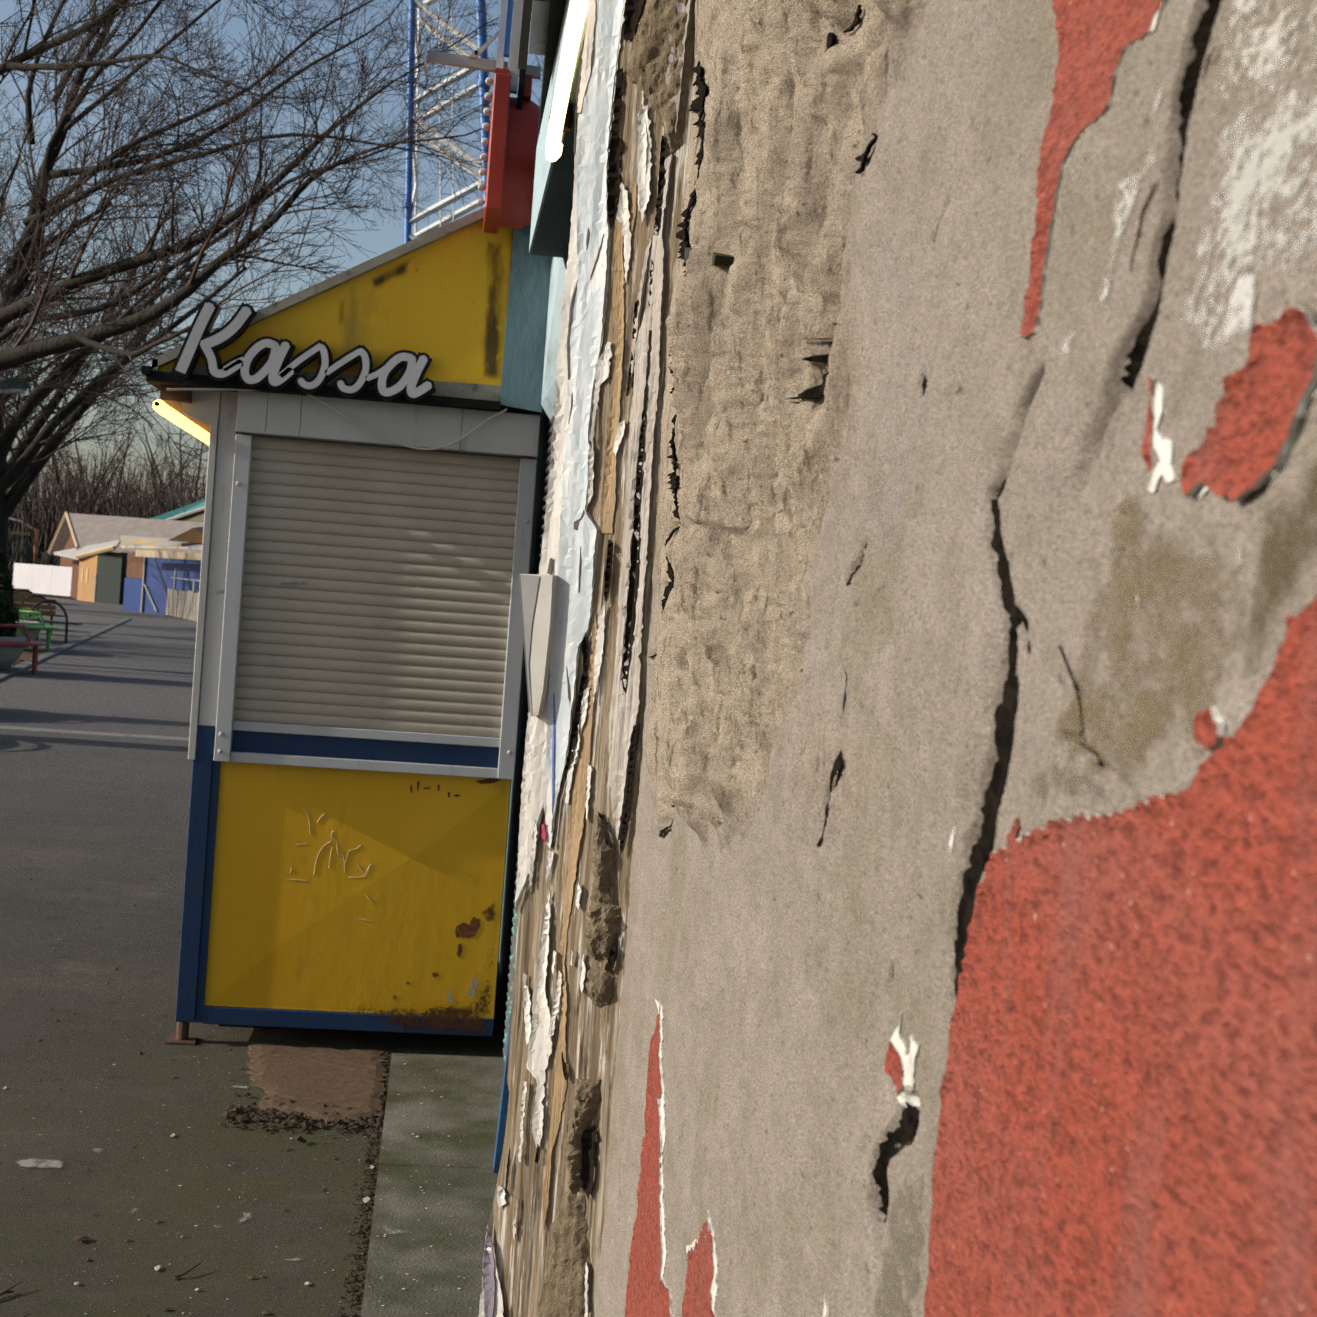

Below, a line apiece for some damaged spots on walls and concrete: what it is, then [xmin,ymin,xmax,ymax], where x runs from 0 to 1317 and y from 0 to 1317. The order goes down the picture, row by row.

peeling [1020,0,1167,339]
crack [1120,0,1221,389]
peeling [1141,308,1317,502]
spalling [515,0,928,1317]
crack [817,749,845,847]
crack [840,671,848,717]
crack [954,467,1105,997]
rust [356,981,490,1034]
rust [455,917,481,957]
peeling [924,596,1317,1317]
crack [872,1101,919,1233]
peeling [478,1224,503,1317]